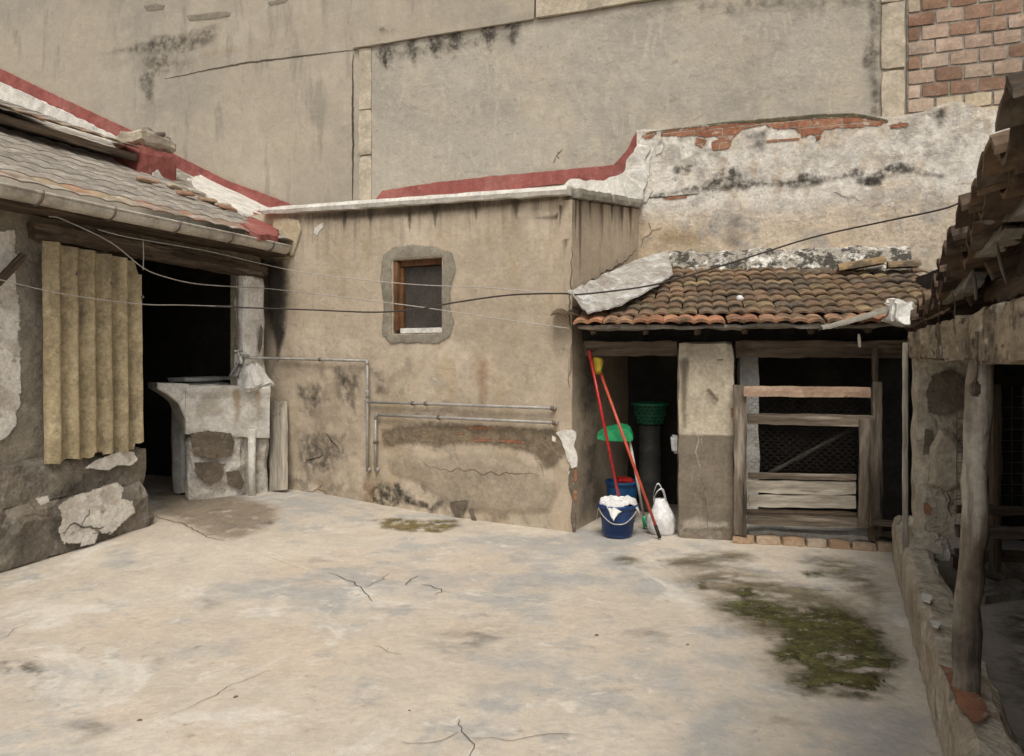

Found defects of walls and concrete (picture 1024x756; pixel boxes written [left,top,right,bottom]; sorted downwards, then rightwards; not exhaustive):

damp [430,32,461,52]
damp [482,24,518,44]
damp [693,168,822,190]
flaking render [642,117,908,202]
damp [782,146,915,186]
peeling [0,229,22,441]
peeling [84,452,138,471]
flaking render [382,424,578,532]
crack [425,463,543,476]
peeling [36,482,135,547]
crack [331,573,442,602]
crack [404,719,579,756]